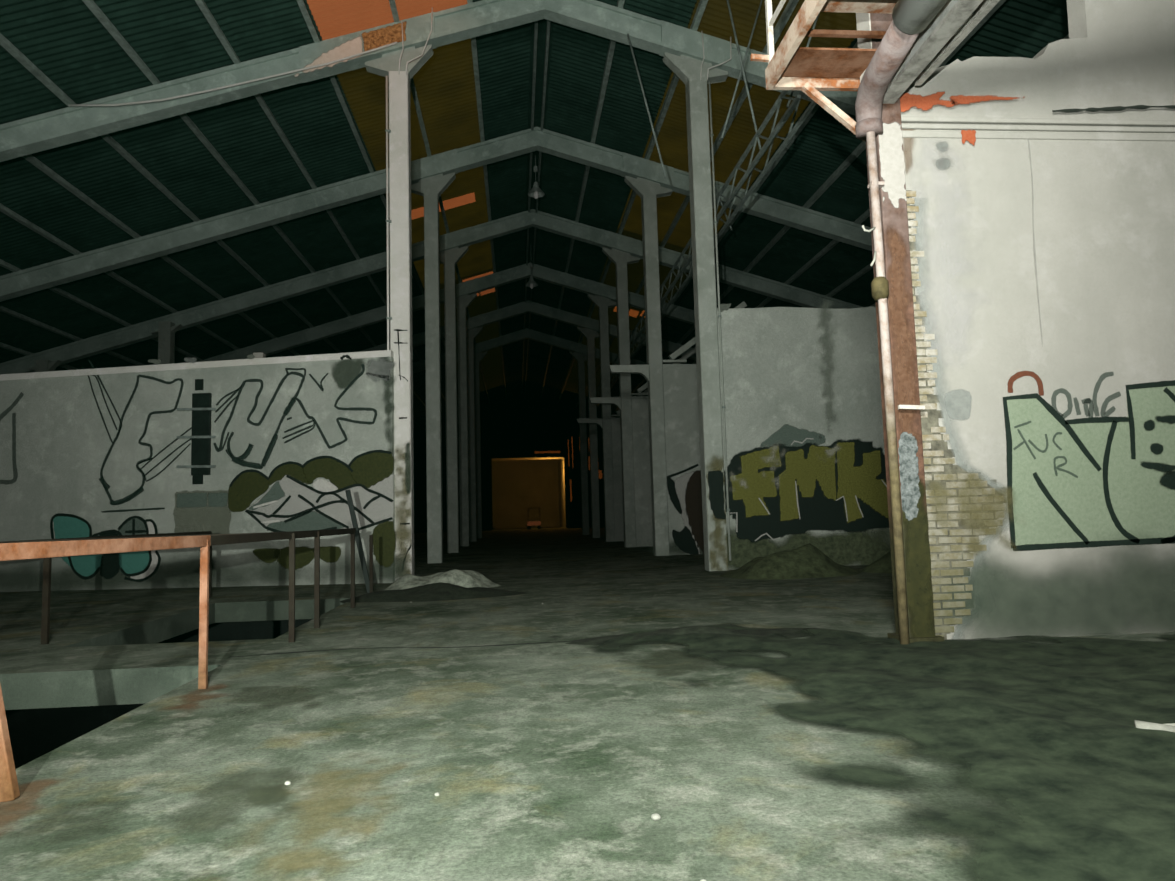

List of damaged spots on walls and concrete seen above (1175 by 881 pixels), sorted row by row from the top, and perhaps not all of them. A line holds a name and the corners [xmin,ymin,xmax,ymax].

leakage [0,558,289,591]
leakage [330,357,412,580]
leakage [822,308,833,419]
corrosion [887,229,918,443]
flaking render [879,91,1025,640]